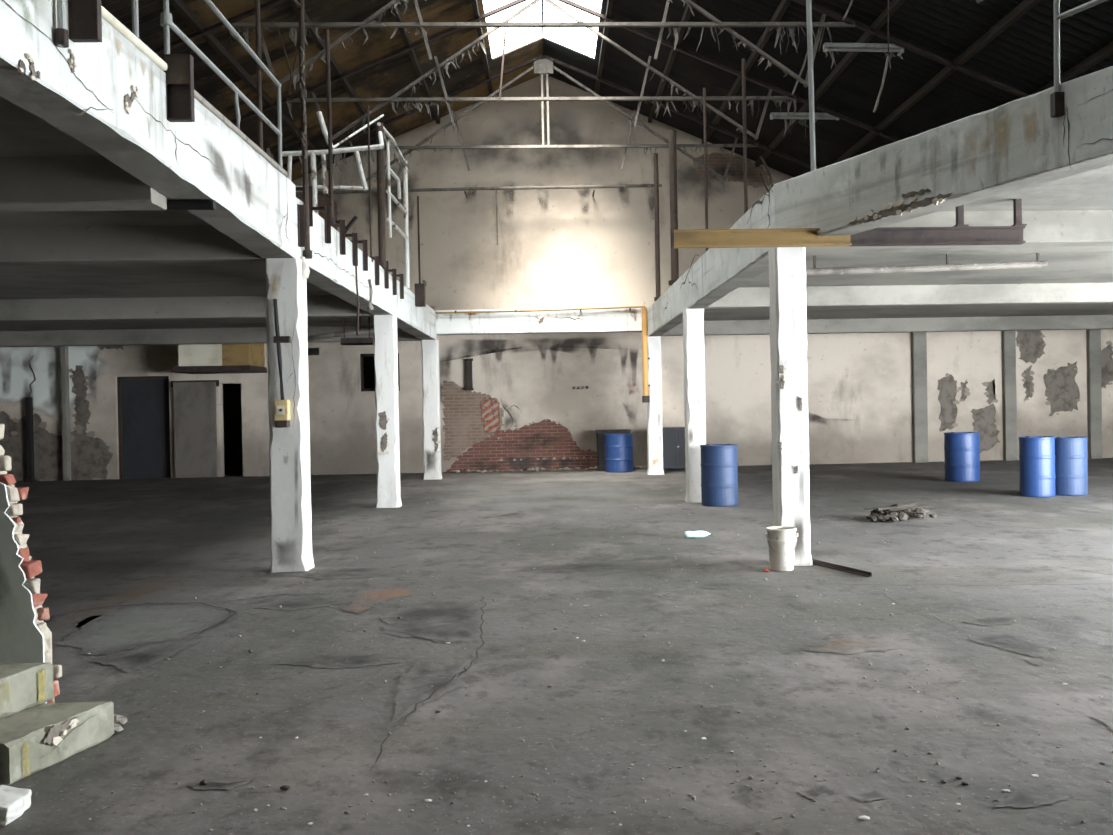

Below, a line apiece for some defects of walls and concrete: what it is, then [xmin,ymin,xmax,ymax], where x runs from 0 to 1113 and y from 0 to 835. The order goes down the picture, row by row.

spalling [17,53,41,81]
spalling [124,85,139,114]
crack [1063,89,1113,169]
spalling [848,188,952,225]
leakage [440,340,518,400]
leakage [540,338,608,361]
leakage [622,351,638,368]
peeling [1016,330,1081,416]
peeling [426,380,597,472]
peeling [937,373,1001,453]
flaking render [18,547,42,579]
crack [369,594,486,771]